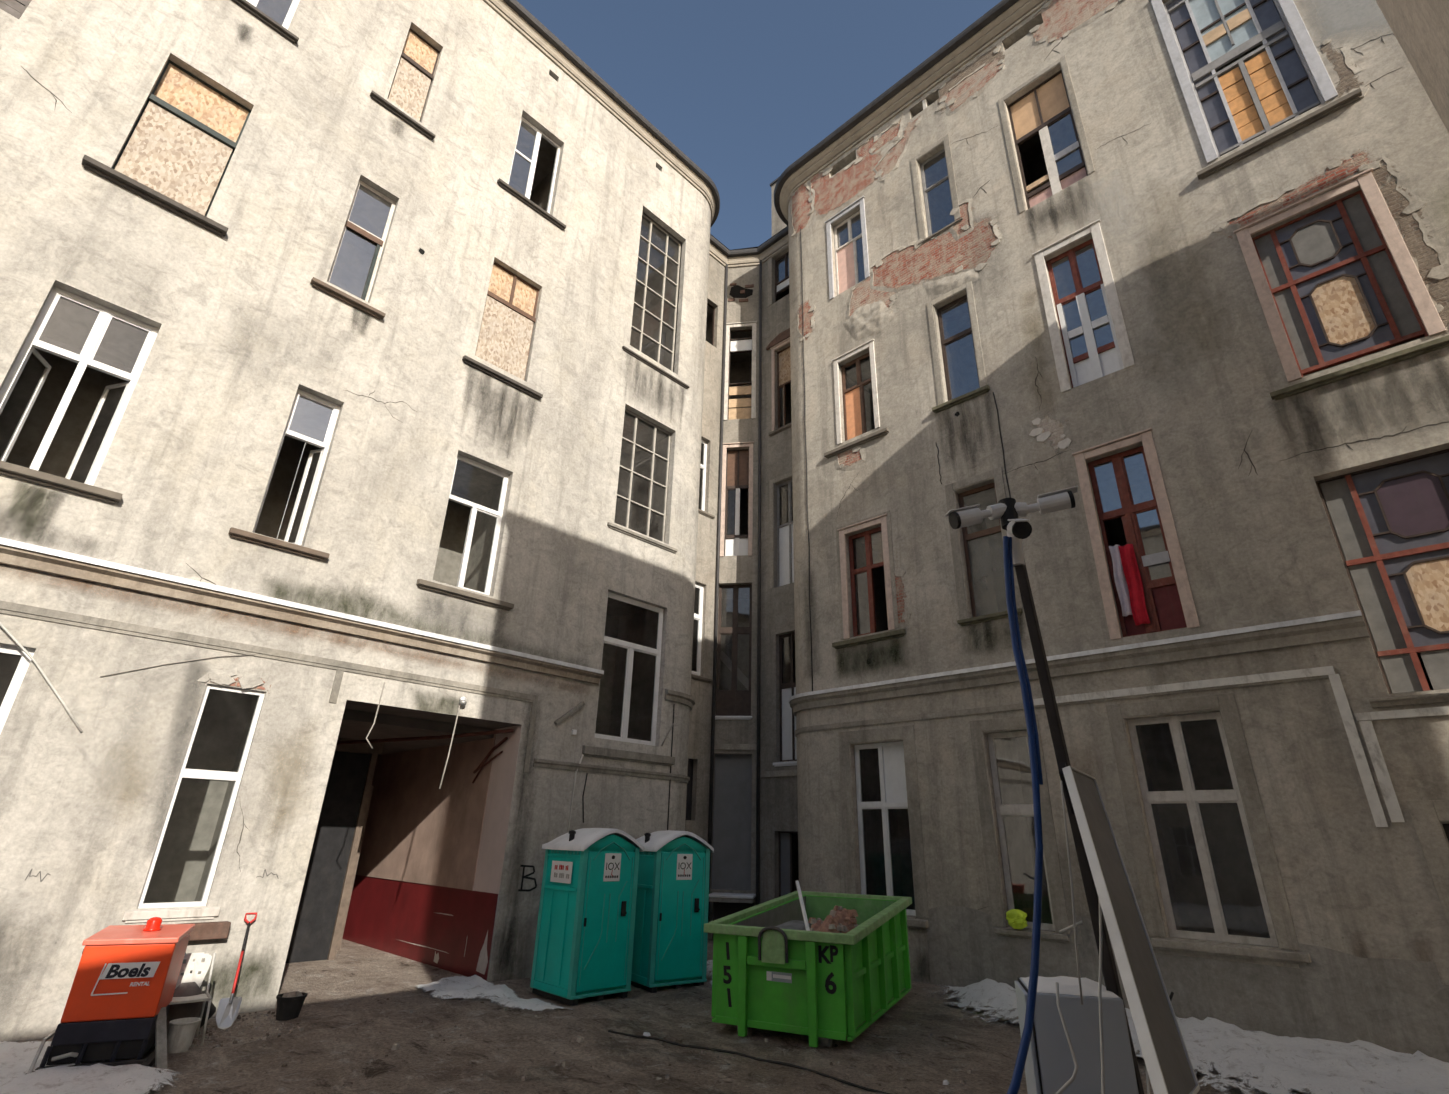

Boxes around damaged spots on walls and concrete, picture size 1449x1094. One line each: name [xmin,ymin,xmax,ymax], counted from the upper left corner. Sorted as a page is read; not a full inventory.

crack [21,66,72,113]
flaking render [790,43,1006,238]
flaking render [845,198,1004,320]
flaking render [1213,148,1449,335]
flaking render [1029,412,1073,455]